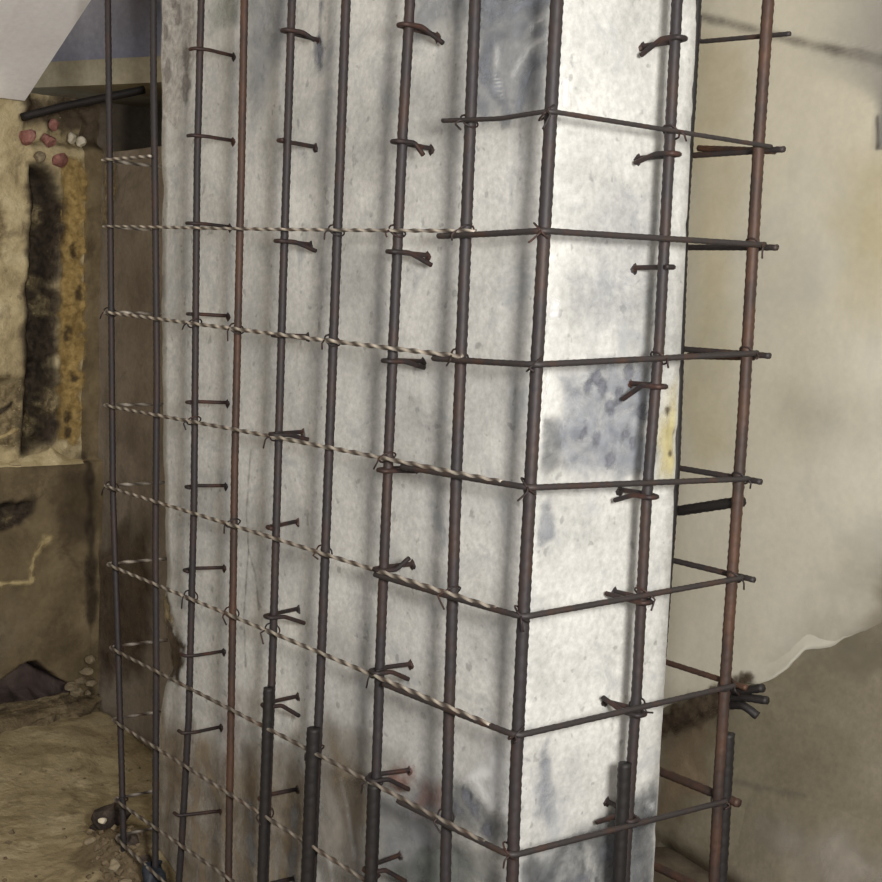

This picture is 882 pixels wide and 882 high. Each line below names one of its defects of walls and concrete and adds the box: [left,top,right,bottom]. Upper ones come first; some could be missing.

spalling [0,158,87,455]
damp [543,364,650,471]
damp [522,841,585,882]
damp [594,813,615,881]